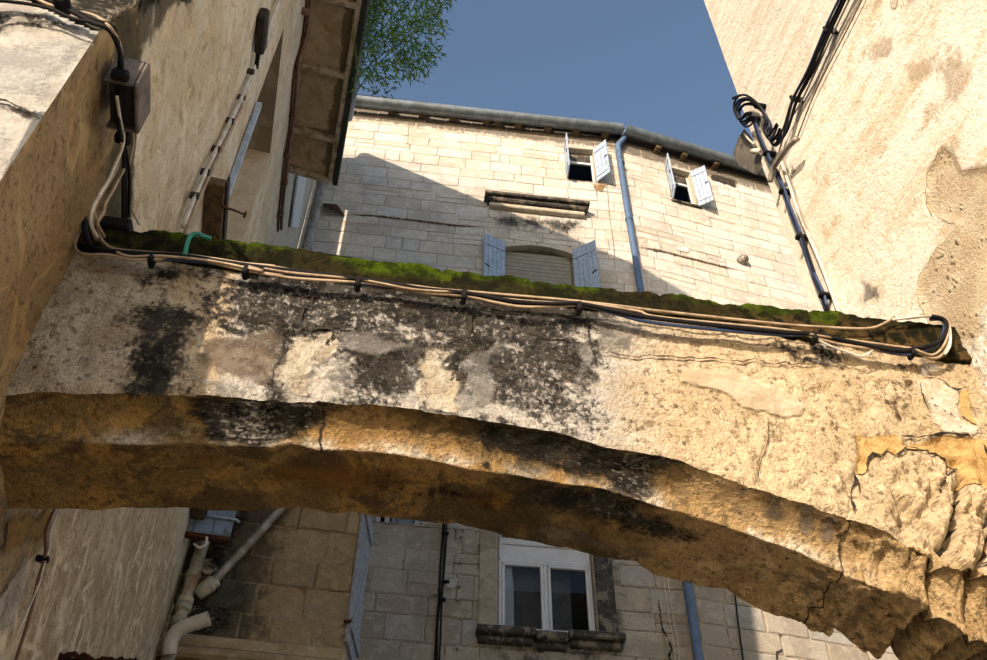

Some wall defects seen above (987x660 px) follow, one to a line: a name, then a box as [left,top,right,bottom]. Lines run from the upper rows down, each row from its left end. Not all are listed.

leakage [0,11,86,98]
leakage [0,105,43,120]
leakage [776,338,843,369]
flaking render [855,145,987,557]
leakage [113,261,699,544]
crack [920,377,964,409]
crack [318,403,327,453]
crack [804,432,987,623]
spalling [975,518,987,568]